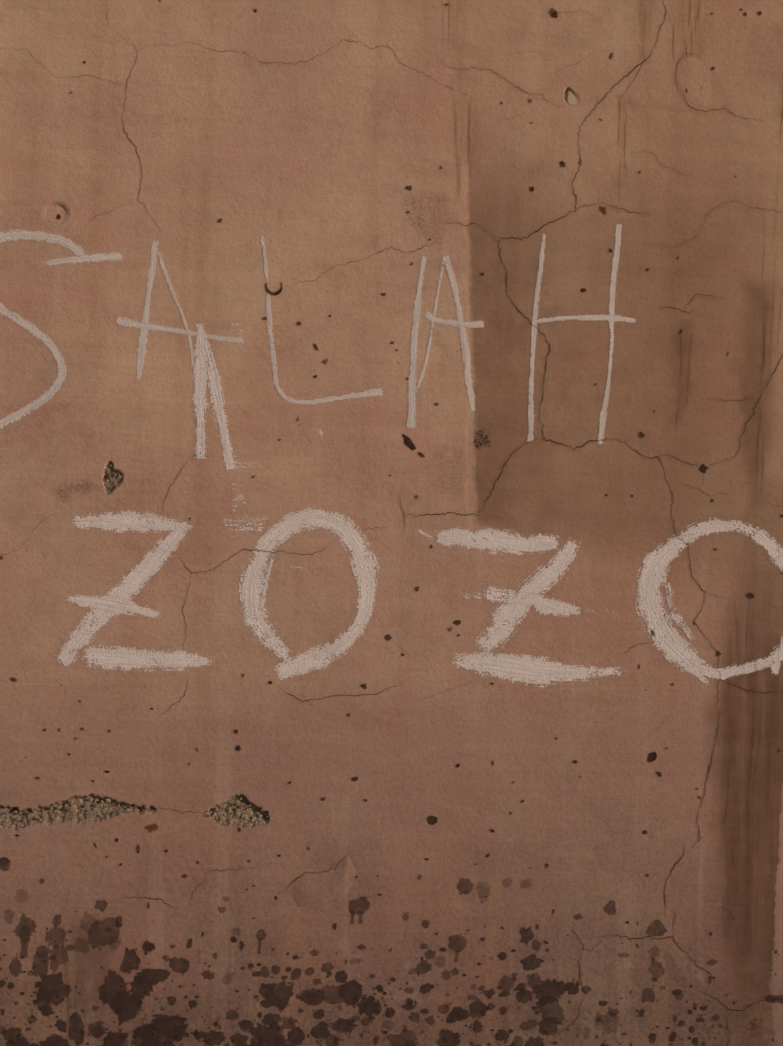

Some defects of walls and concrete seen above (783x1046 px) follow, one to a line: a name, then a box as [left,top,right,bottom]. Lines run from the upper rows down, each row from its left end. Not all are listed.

crack [498,3,783,694]
crack [359,447,520,529]
crack [180,549,323,633]
spalling [0,780,156,837]
spalling [200,794,270,832]
damp [723,635,783,963]